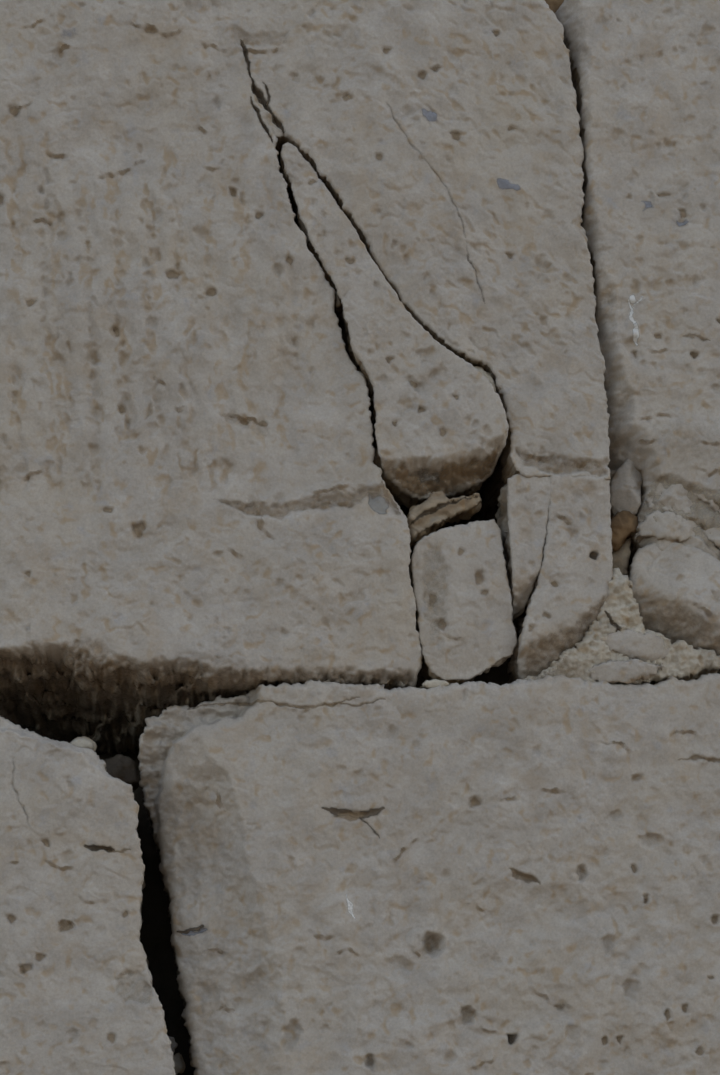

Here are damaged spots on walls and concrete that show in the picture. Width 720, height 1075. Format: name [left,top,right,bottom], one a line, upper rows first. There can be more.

crack [241,40,284,142]
spalling [609,459,720,576]